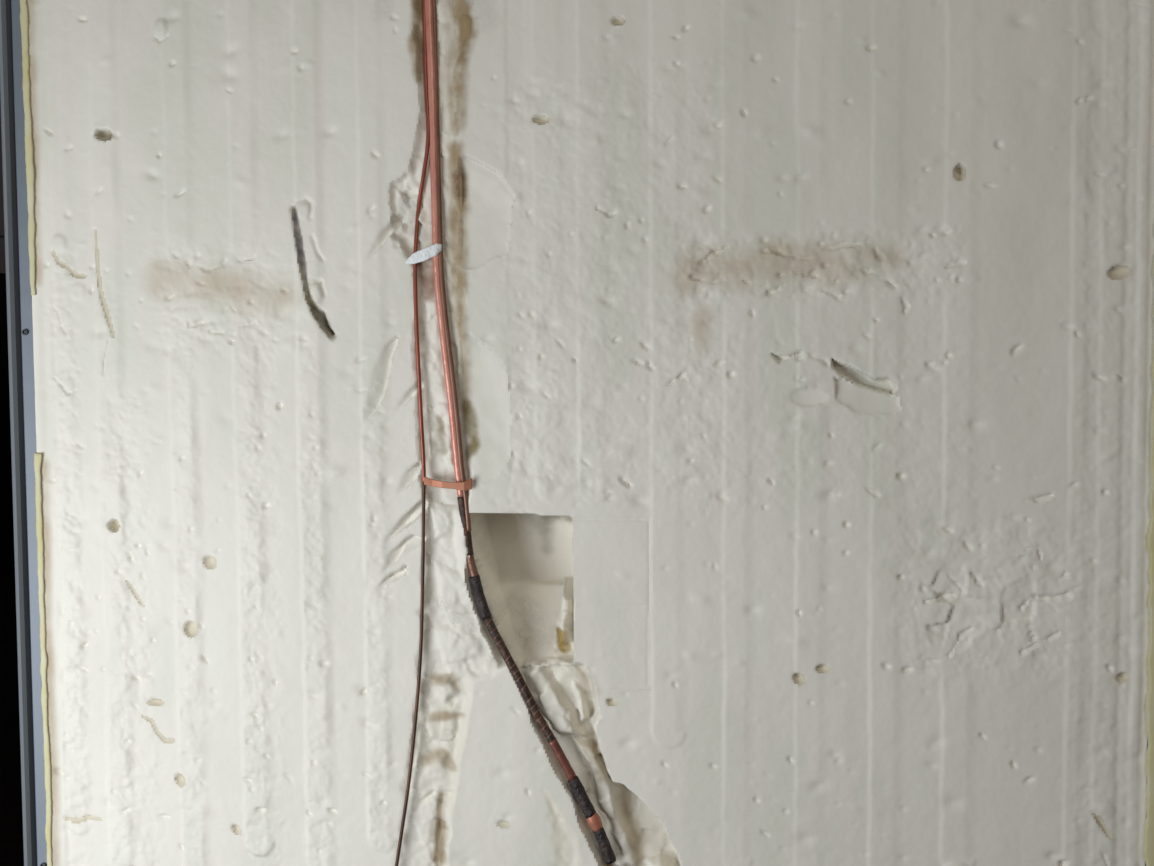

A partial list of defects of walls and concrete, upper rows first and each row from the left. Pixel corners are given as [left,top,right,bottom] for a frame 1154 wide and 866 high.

leakage [454,0,472,96]
leakage [450,145,465,290]
leakage [464,403,478,453]
spalling [388,0,682,866]
spalling [833,360,902,417]